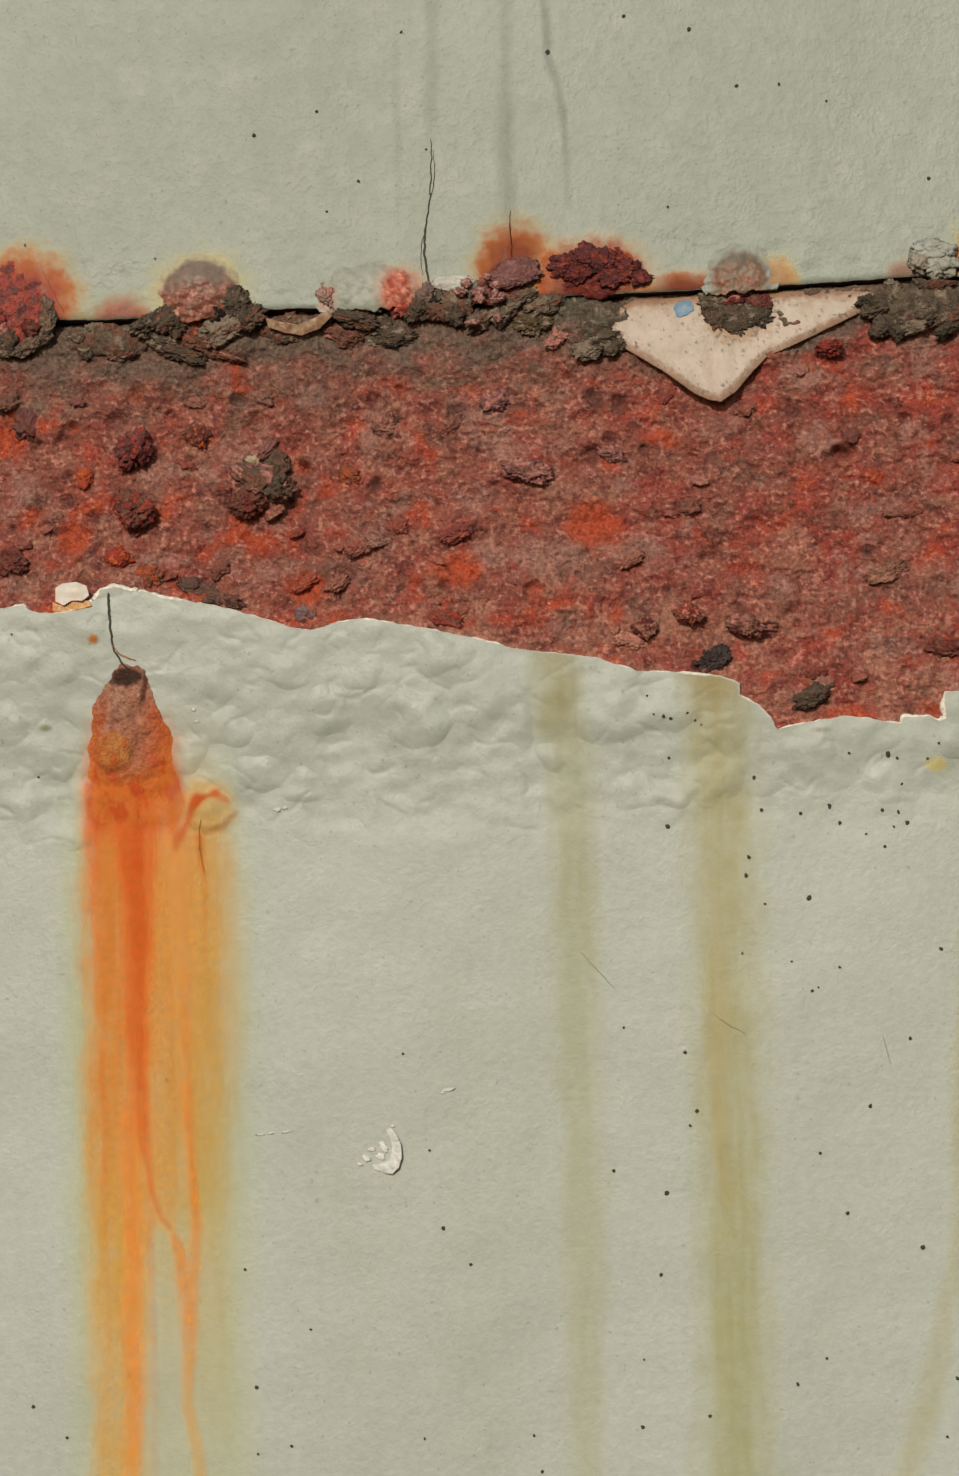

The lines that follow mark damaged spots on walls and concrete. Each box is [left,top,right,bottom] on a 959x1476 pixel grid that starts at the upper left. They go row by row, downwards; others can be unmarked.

peeling [266,310,333,336]
peeling [612,288,873,402]
rust [0,229,959,729]
peeling [52,582,91,612]
rust [84,663,232,1476]